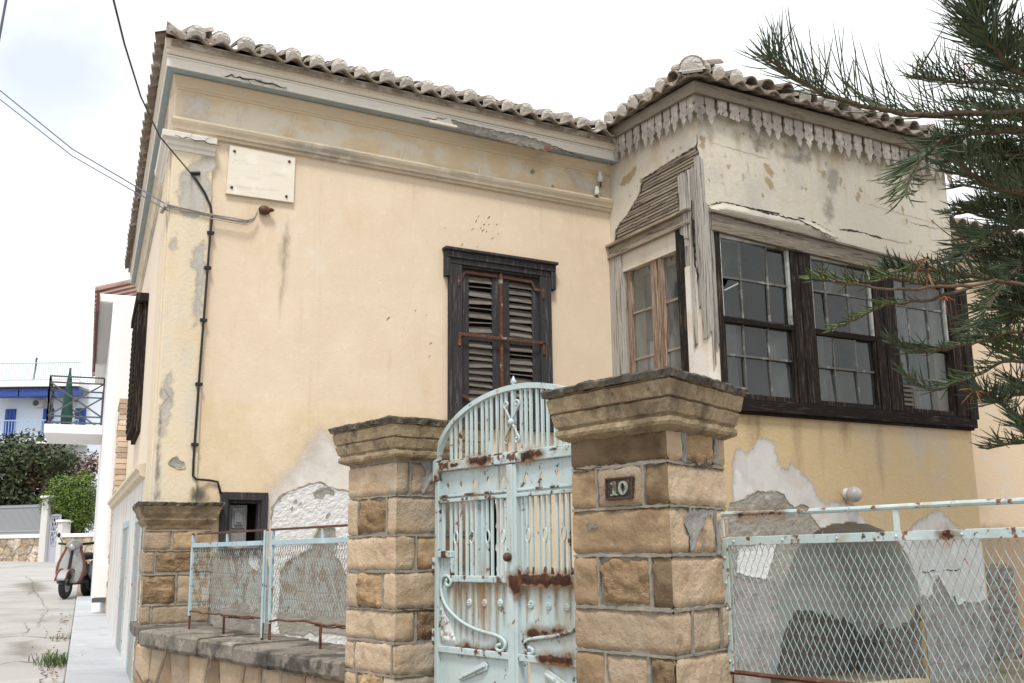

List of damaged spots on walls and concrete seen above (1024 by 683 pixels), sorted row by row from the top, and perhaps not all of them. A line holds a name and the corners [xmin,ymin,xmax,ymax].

crack [225,74,286,88]
peeling [179,156,216,218]
spalling [614,136,705,241]
crack [840,204,937,244]
spalling [168,456,186,470]
rust [450,455,490,469]
rust [520,448,557,464]
spalling [207,430,352,645]
flaking render [728,438,1023,683]
rust [454,566,574,623]
rust [525,626,564,641]
rust [537,653,573,667]